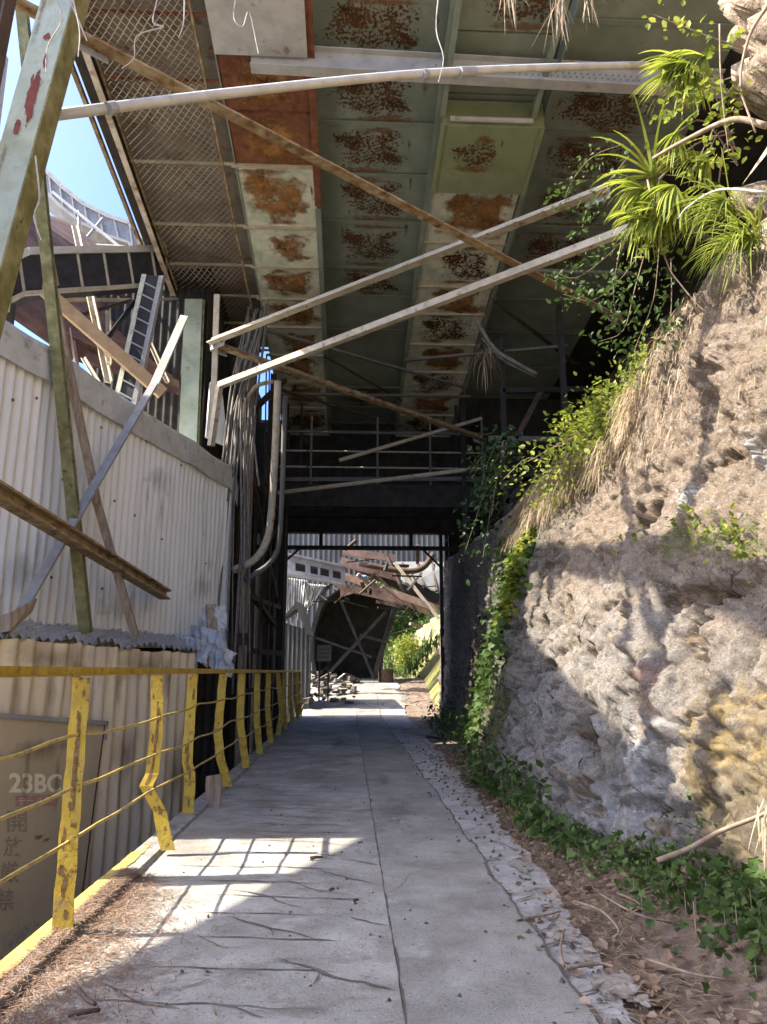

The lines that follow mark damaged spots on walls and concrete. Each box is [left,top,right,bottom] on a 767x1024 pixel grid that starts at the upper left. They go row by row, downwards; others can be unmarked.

rust [314,0,438,51]
rust [237,58,325,428]
rust [326,81,426,295]
rust [451,136,503,172]
rust [446,193,512,239]
rust [517,92,666,268]
rust [404,247,490,431]